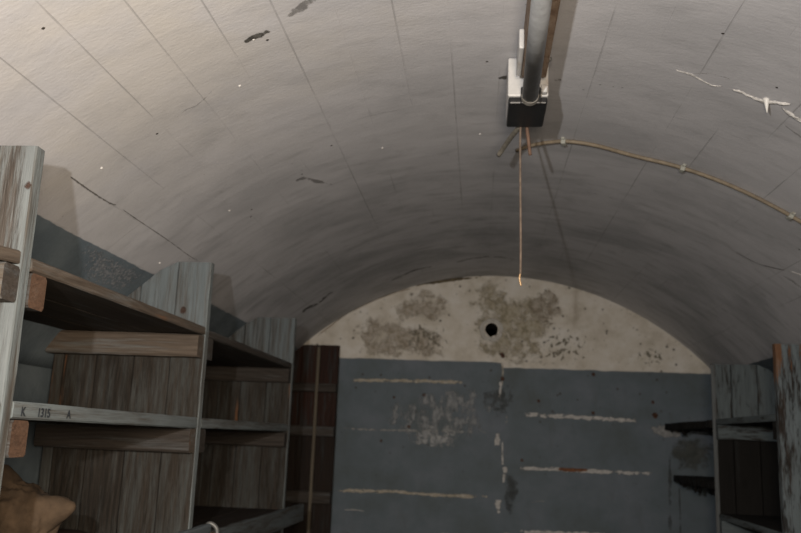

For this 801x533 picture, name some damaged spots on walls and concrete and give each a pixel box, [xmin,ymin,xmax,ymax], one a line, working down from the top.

crack [676,70,801,123]
crack [71,177,198,261]
water stain [319,277,477,357]
water stain [473,284,585,363]